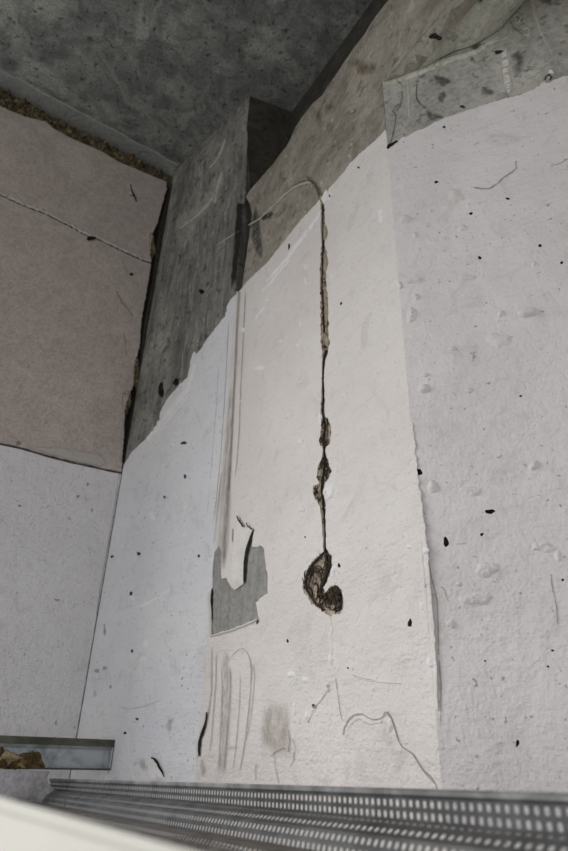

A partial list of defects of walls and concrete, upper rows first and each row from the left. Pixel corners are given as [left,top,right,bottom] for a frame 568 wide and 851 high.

crack [122,185,170,469]
crack [318,196,330,552]
peeling [206,516,268,637]